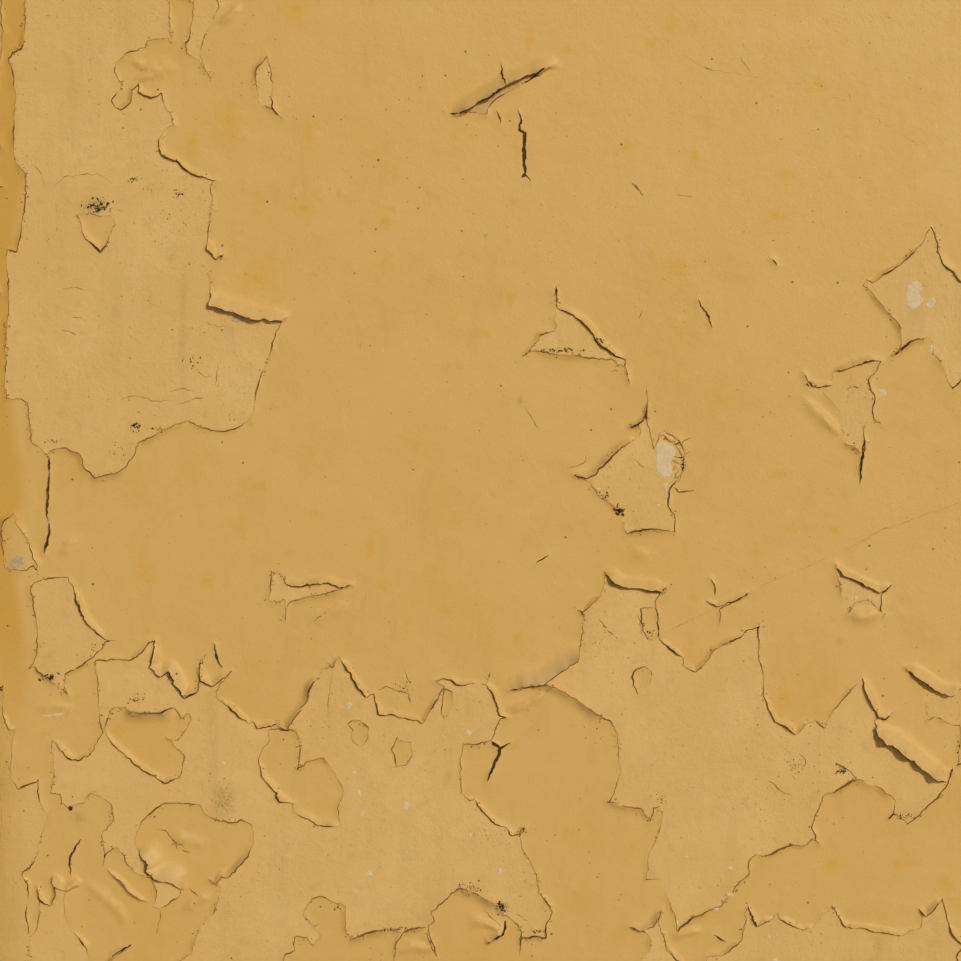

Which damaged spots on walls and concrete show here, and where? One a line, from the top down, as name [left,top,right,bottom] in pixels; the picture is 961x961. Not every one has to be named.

peeling [1,0,290,482]
crack [499,110,530,180]
peeling [522,285,627,374]
peeling [572,393,687,536]
peeling [807,227,961,479]
peeling [0,514,552,961]
crack [490,742,503,773]
peeling [509,564,961,961]